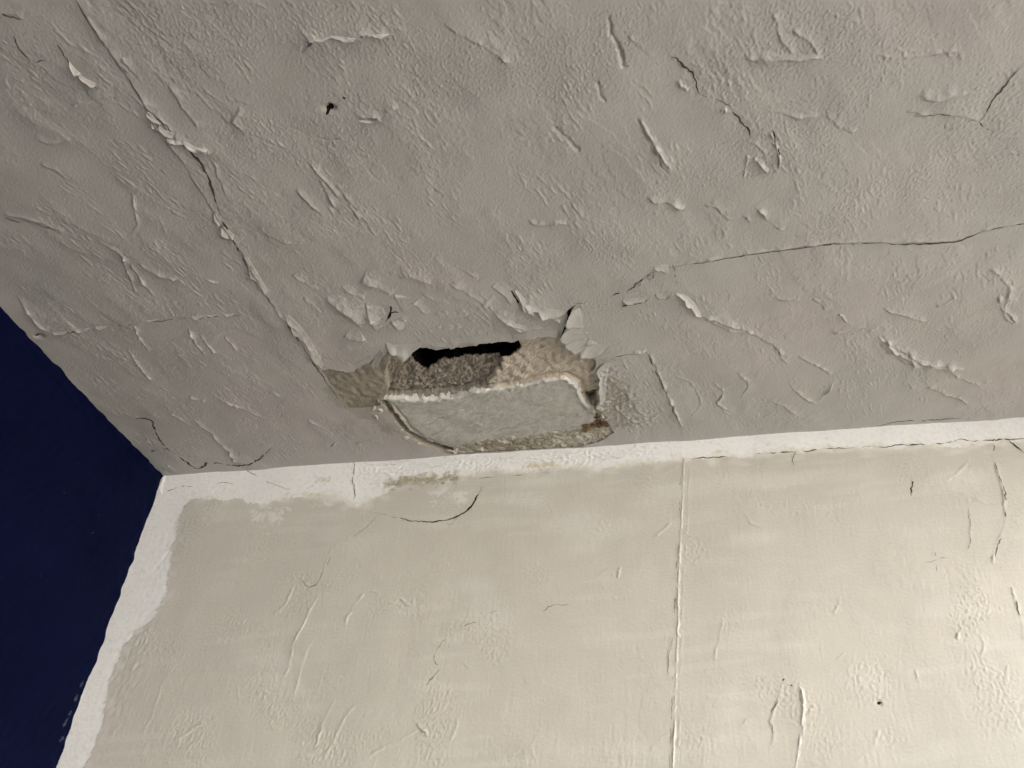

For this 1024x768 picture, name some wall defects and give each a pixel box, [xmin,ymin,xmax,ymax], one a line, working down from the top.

crack [980,70,1018,130]
crack [34,1,347,410]
crack [672,223,1023,282]
spalling [322,290,634,484]
crack [122,413,291,491]
crack [352,463,489,536]